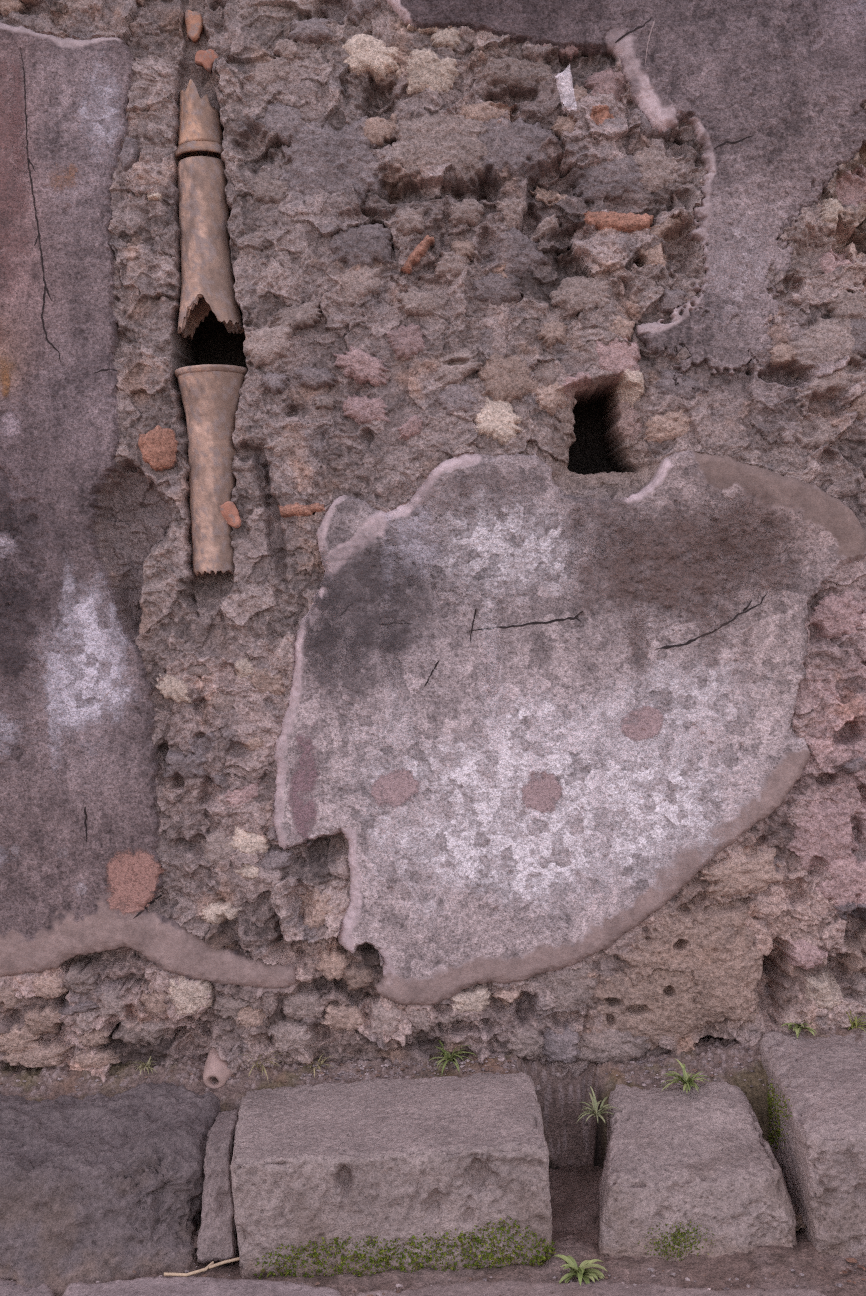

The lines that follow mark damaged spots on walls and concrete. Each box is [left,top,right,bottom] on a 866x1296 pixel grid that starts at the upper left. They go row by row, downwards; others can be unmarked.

crack [21,54,61,362]
spalling [0,0,866,964]